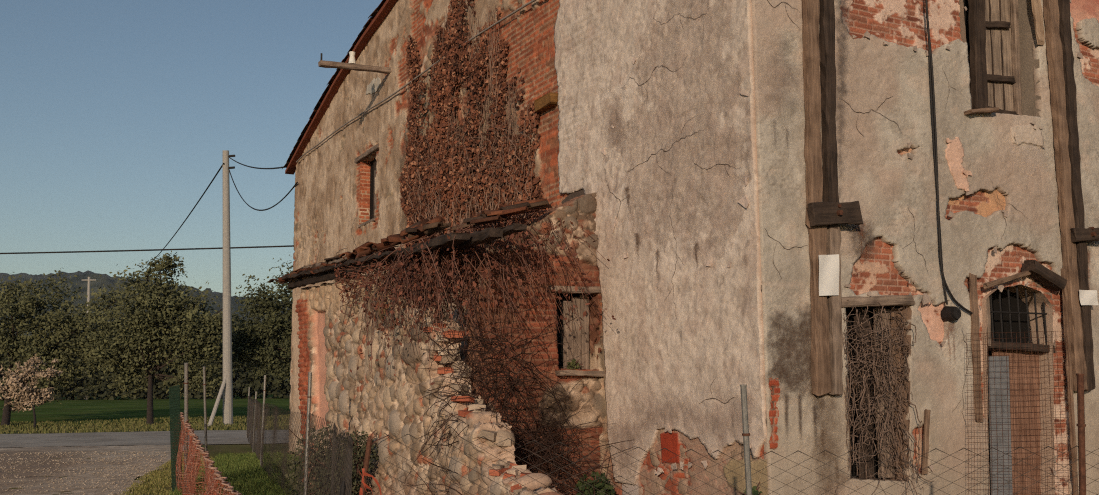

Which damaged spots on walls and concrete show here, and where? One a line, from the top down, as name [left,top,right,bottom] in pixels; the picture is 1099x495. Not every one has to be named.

spalling [840,0,967,56]
spalling [1070,0,1099,86]
spalling [945,137,1008,220]
spalling [844,237,946,346]
spalling [964,244,1075,495]
spalling [622,378,780,495]